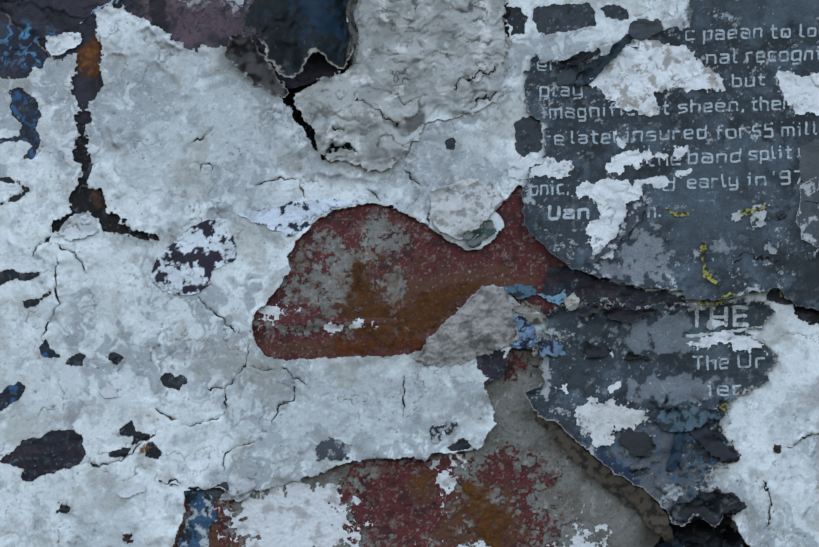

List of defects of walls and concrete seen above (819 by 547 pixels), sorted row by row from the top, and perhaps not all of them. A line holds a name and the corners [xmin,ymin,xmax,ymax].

spalling [504,2,629,35]
peeling [0,0,354,241]
crack [283,101,357,160]
spalling [514,115,543,157]
spalling [0,269,40,285]
corrosion [334,257,485,355]
spalling [766,288,819,325]
crack [75,297,305,468]
peeling [149,176,686,547]
spalling [0,430,86,481]
corrosion [459,475,512,547]
crack [763,480,772,526]